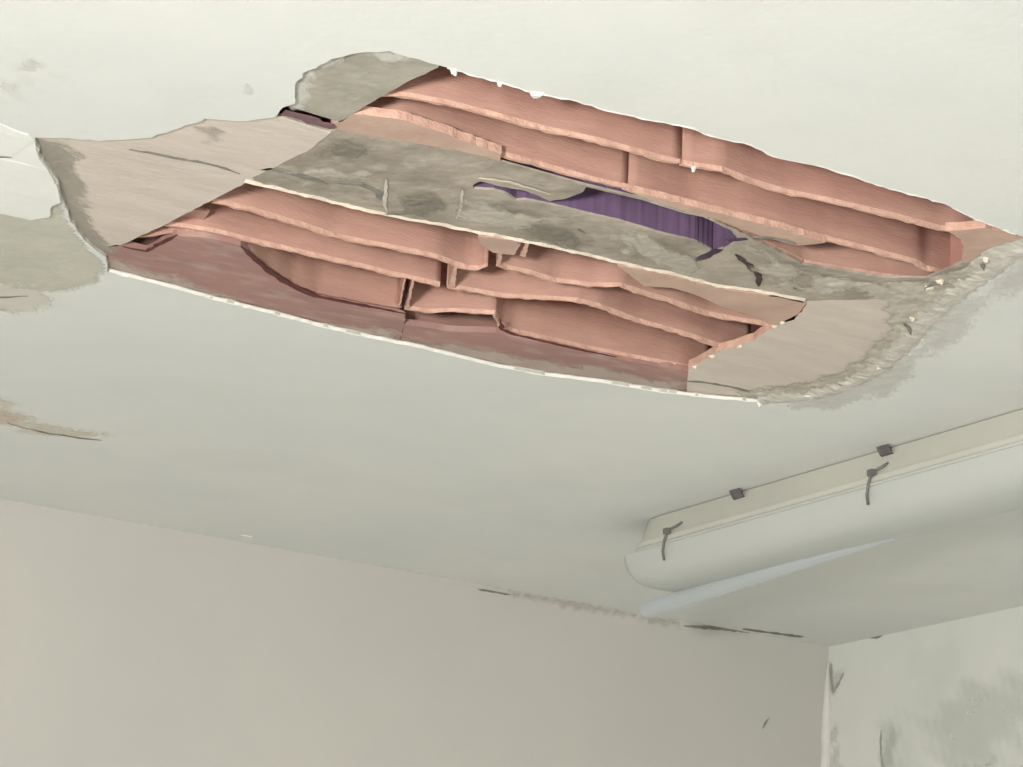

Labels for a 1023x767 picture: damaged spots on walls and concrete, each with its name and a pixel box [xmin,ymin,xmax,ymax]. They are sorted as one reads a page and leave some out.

spalling [0,67,1023,408]